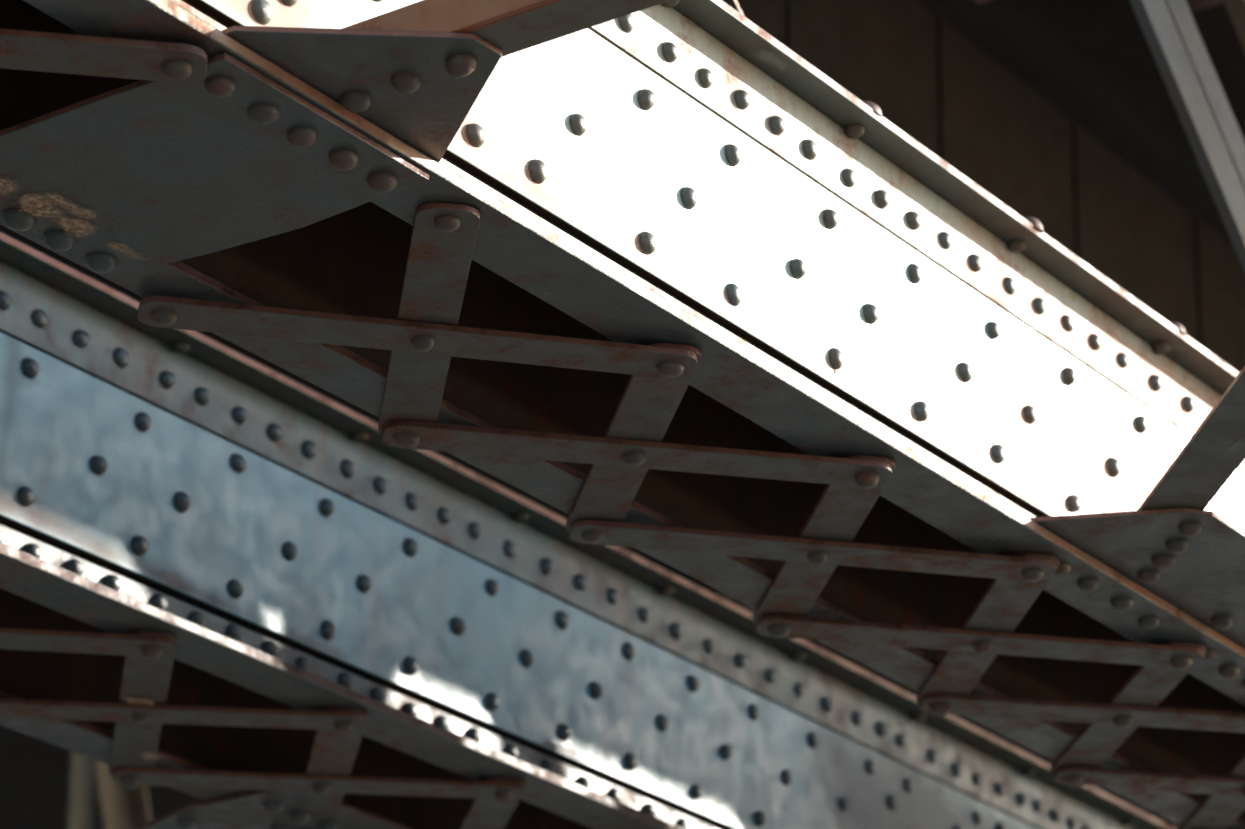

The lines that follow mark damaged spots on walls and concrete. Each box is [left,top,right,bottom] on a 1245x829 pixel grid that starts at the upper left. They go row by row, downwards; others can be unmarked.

rust [231,0,309,27]
rust [0,179,92,236]
rust [455,120,569,217]
rust [712,288,815,367]
rust [993,283,1214,429]
rust [923,359,1167,515]